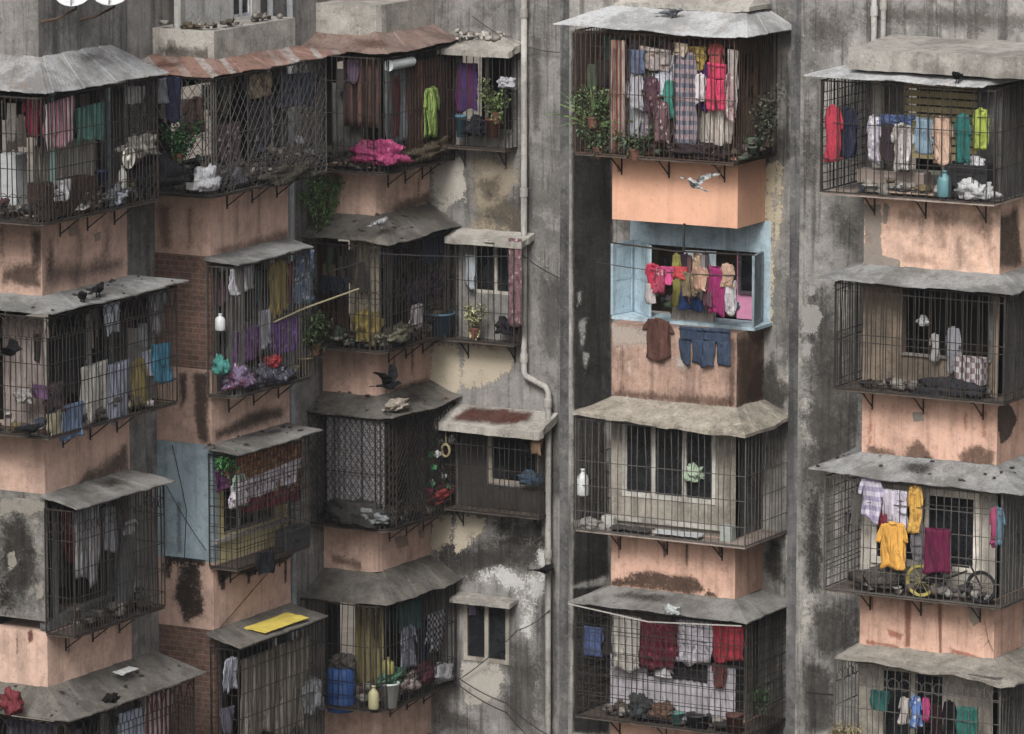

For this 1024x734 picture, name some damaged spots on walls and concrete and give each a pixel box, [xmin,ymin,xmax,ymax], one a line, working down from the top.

peeling [430,155,467,212]
peeling [864,204,900,267]
damp [572,31,788,734]
rust [455,408,530,424]
damp [0,514,38,614]
mould [162,556,206,622]